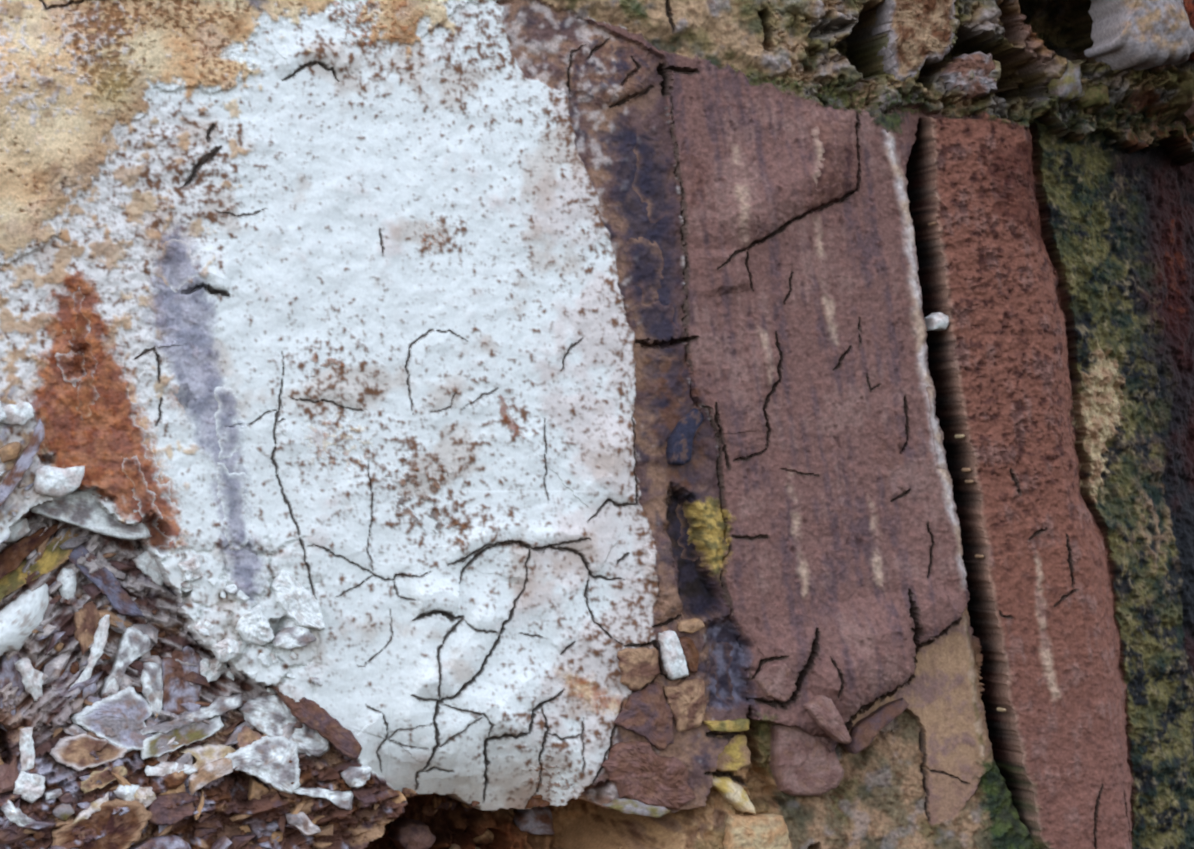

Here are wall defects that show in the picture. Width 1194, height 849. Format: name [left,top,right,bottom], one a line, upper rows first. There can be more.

rust [25,268,194,557]
crack [131,347,165,427]
crack [403,328,501,416]
crack [560,337,584,373]
crack [564,0,1024,788]
peeling [0,418,45,506]
peeling [30,489,152,540]
crack [244,350,690,805]
peeling [0,654,44,788]
peeling [49,545,362,843]
crack [917,728,971,824]
peeling [129,835,191,849]